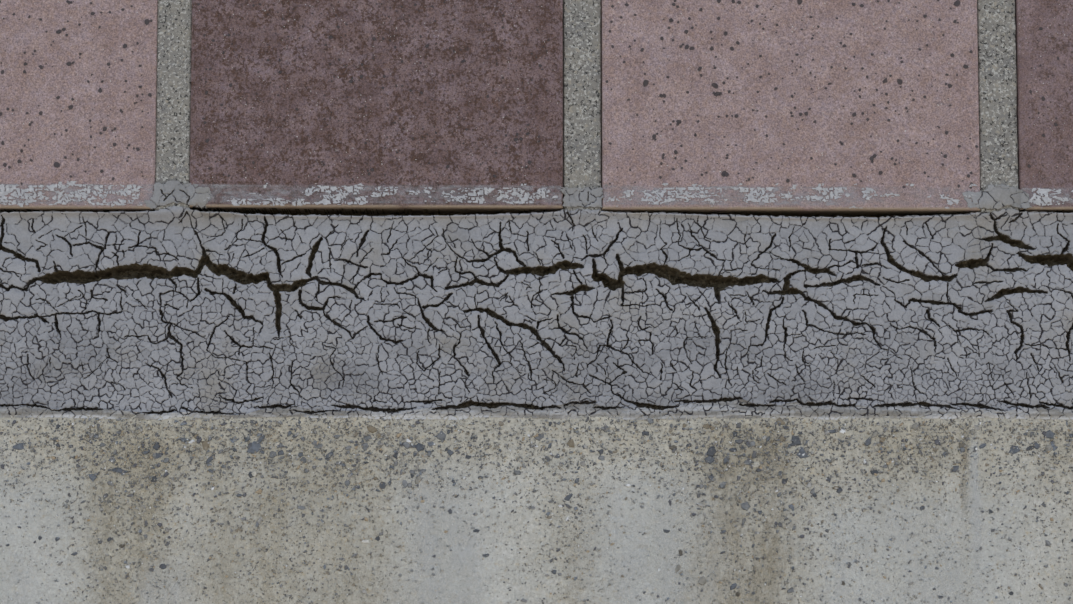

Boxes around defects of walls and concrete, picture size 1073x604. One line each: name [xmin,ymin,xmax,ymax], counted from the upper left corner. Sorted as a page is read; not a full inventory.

peeling [0,181,153,207]
peeling [207,183,558,206]
peeling [603,183,914,208]
peeling [928,184,977,209]
peeling [1025,188,1073,206]
crack [0,182,1073,420]